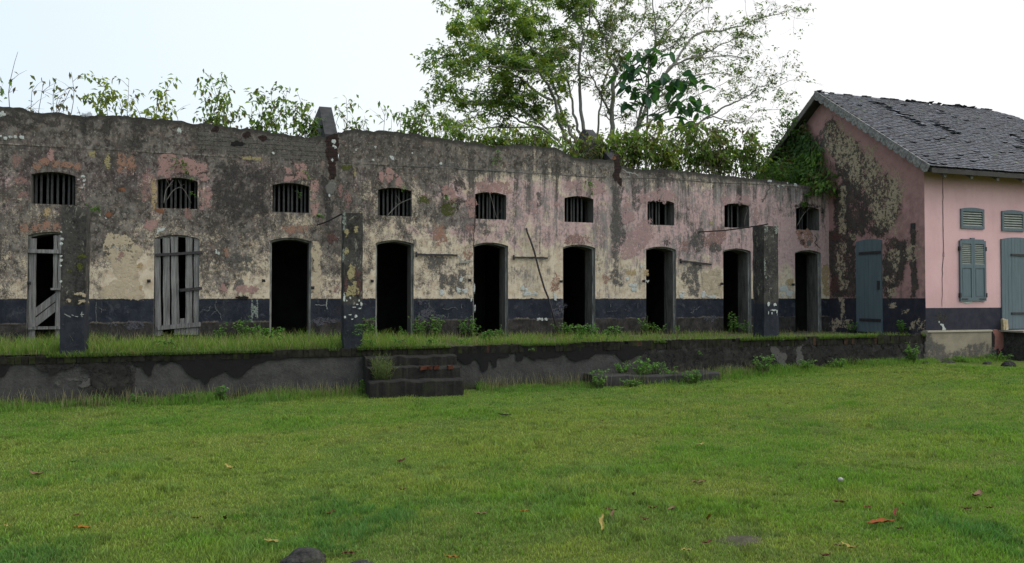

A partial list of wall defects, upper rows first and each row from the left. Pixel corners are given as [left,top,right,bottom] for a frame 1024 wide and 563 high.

peeling [68,232,145,304]
spalling [144,126,353,299]
damp [609,185,649,291]
peeling [701,269,723,298]
damp [794,118,919,300]
peeling [822,115,926,332]
damp [134,355,293,385]